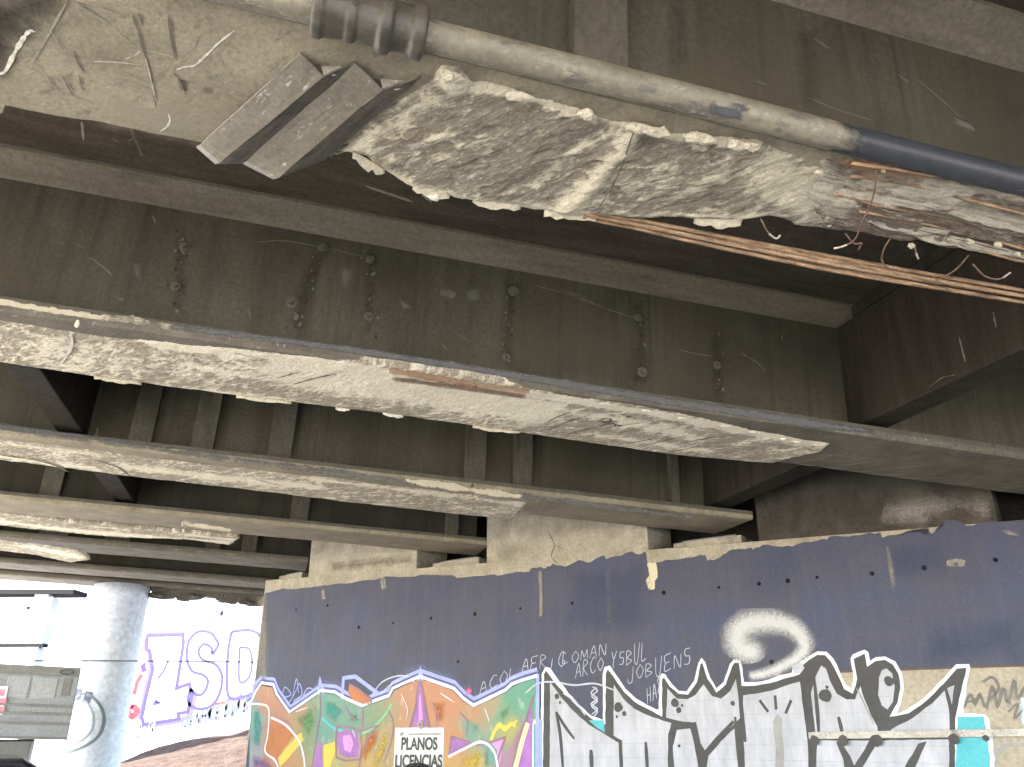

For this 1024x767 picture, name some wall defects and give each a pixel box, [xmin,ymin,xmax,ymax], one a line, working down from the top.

spalling [331,65,1024,263]
rust [841,159,969,185]
peeling [0,299,148,321]
spalling [0,320,872,463]
rust [389,368,530,398]
spalling [0,423,693,519]
spalling [0,512,240,545]
spalling [0,540,91,563]
peeling [646,562,658,590]
peeling [947,559,965,567]